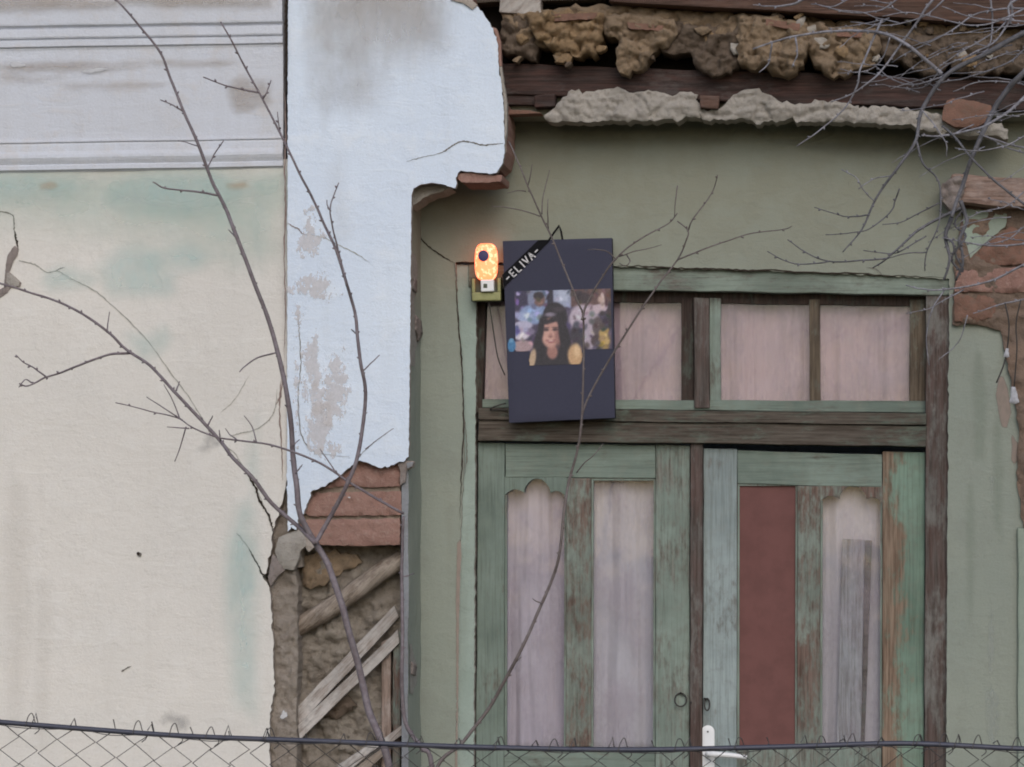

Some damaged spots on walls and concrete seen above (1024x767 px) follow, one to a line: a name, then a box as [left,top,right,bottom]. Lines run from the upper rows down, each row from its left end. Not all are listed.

crack [410,140,503,161]
flaking render [544,87,1008,143]
crack [0,211,248,417]
crack [228,0,369,533]
peeling [296,205,327,259]
peeling [284,273,343,329]
peeling [293,334,352,460]
spalling [939,174,1024,528]
crack [237,534,269,575]
flaking render [268,461,418,767]